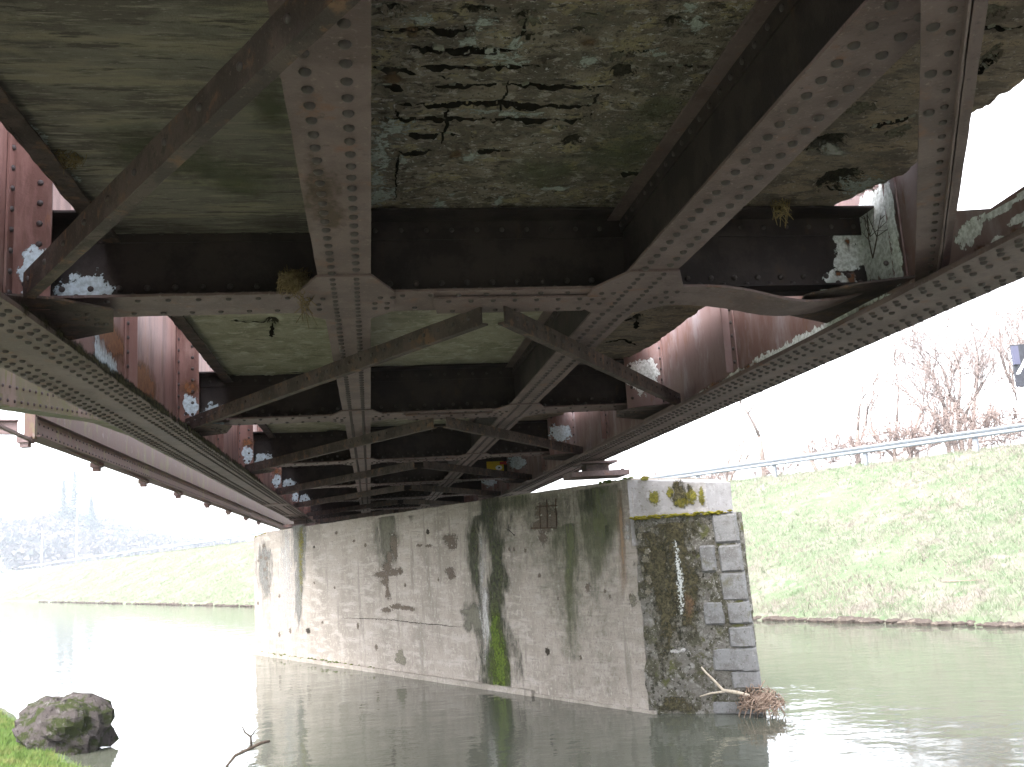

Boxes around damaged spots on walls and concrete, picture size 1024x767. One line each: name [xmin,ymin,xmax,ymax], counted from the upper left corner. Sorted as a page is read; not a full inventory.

crack [371,3,635,200]
spalling [804,133,849,153]
spalling [812,167,864,192]
water stain [375,516,396,565]
water stain [460,486,629,687]
water stain [673,541,685,615]